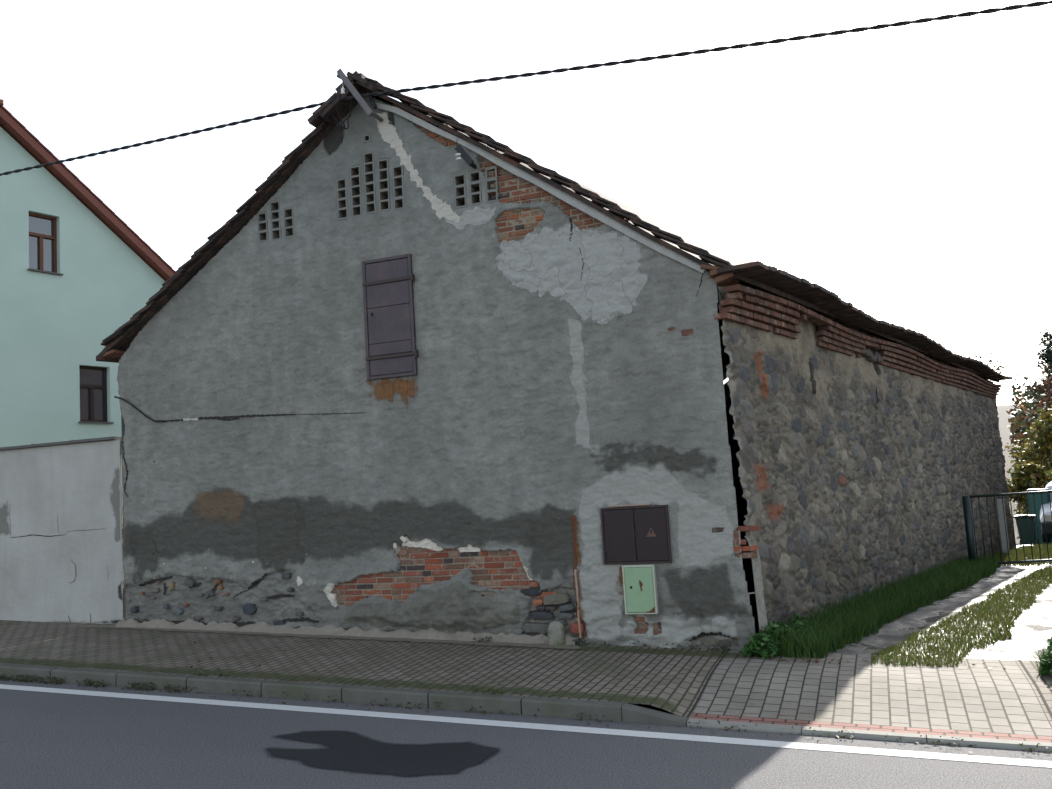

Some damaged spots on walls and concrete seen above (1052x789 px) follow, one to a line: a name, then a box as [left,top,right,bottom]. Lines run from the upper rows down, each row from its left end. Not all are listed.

flaking render [391,102,648,324]
crack [9,441,128,538]
water stain [111,469,574,600]
flaking render [103,536,587,640]